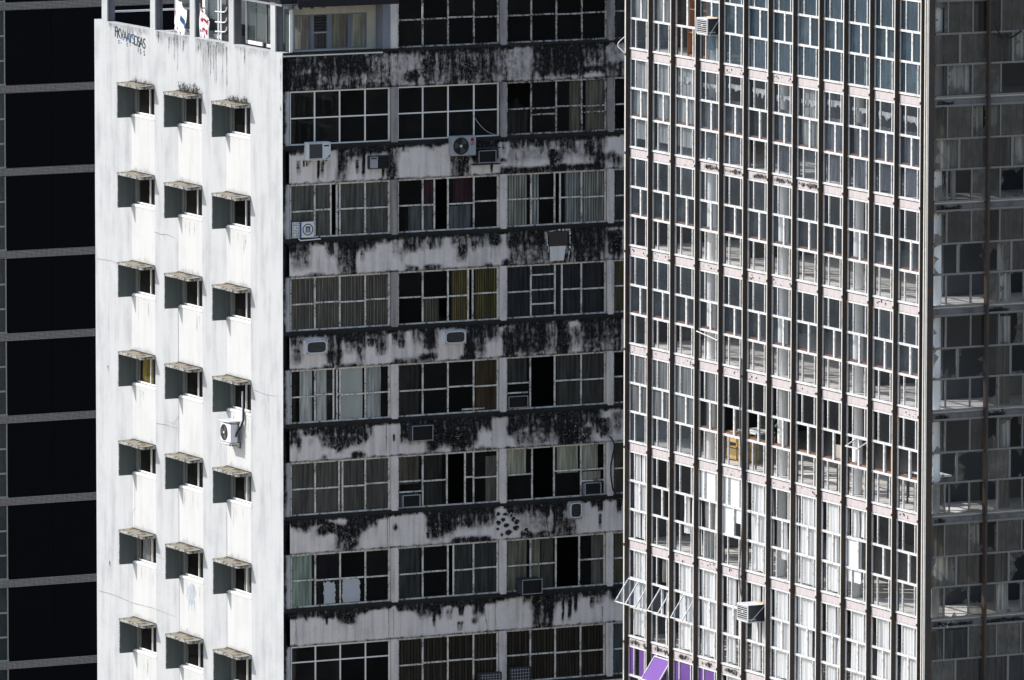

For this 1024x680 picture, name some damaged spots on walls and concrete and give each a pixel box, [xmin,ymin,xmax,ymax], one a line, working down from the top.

damp [280,41,625,213]
damp [283,226,624,680]